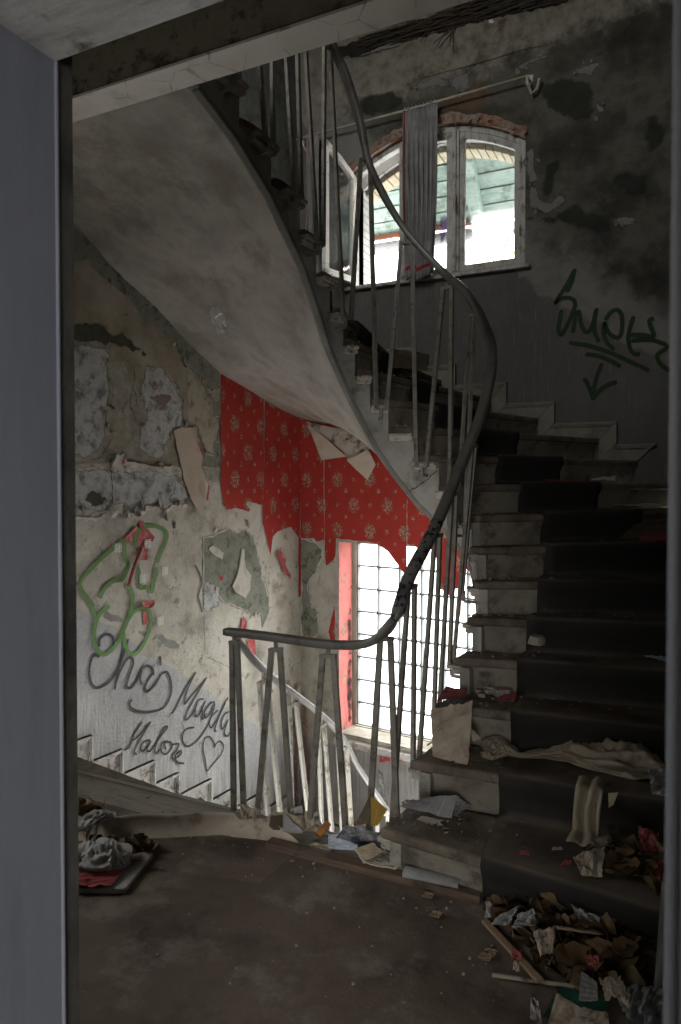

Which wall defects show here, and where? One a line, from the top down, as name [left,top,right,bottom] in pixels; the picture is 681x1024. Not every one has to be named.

leakage [542,79,594,120]
flaking render [344,128,403,183]
flaking render [437,111,565,214]
flaking render [73,227,221,525]
flaking render [201,518,271,627]